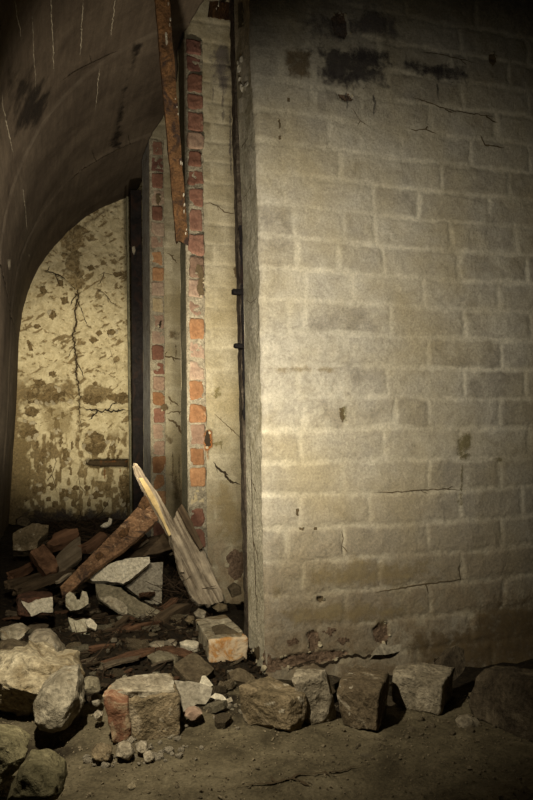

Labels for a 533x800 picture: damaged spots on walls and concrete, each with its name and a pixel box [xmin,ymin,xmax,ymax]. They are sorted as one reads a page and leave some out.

water stain [287,49,387,87]
water stain [405,61,465,90]
crack [411,96,502,148]
spalling [47,296,69,320]
crack [45,268,125,433]
spalling [89,329,118,344]
spalling [18,371,133,507]
crack [214,414,256,492]
crack [374,486,456,494]
crack [379,562,461,592]
spalling [252,627,349,672]
spalling [373,621,391,644]